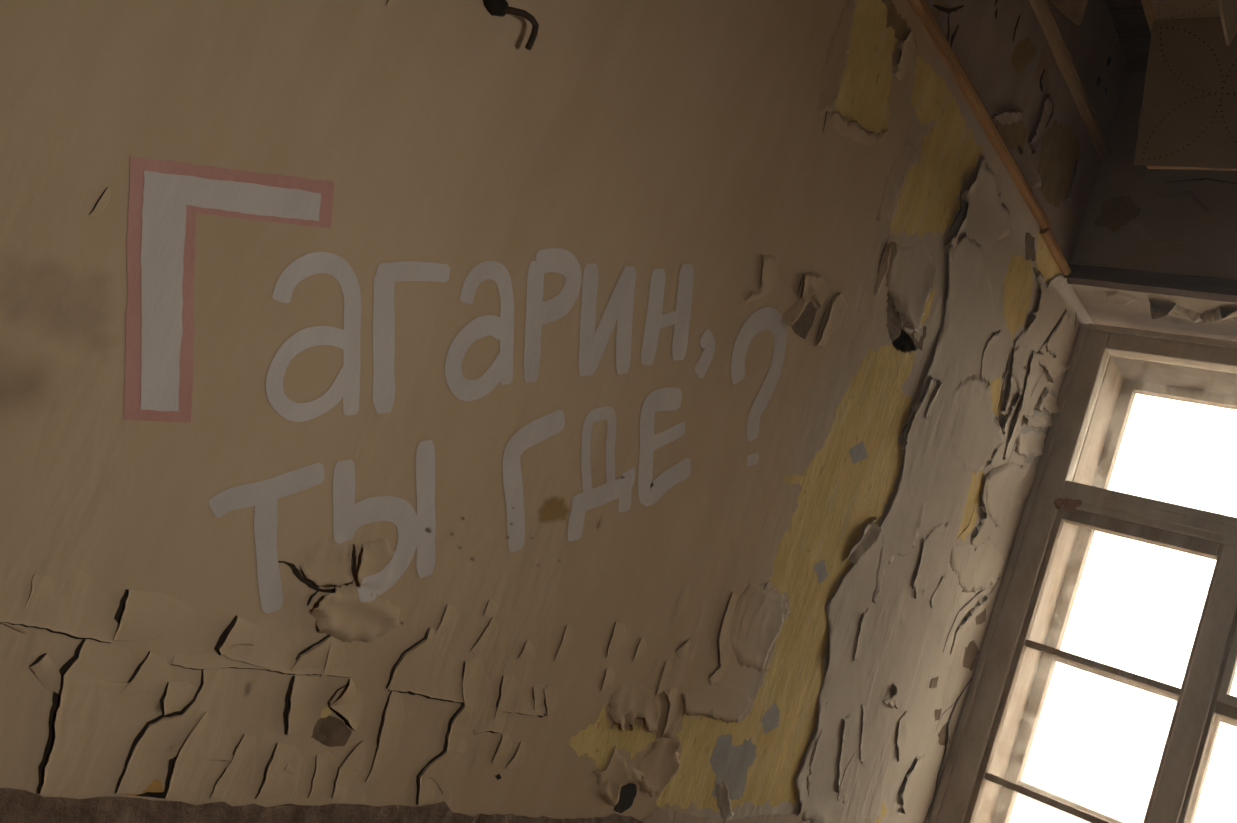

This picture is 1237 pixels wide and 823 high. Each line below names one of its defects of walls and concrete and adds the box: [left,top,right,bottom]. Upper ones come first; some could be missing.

peeling [818,0,917,148]
peeling [1107,291,1237,325]
peeling [569,56,1071,823]
peeling [278,538,401,643]
spalling [311,678,364,747]
spalling [0,788,725,823]